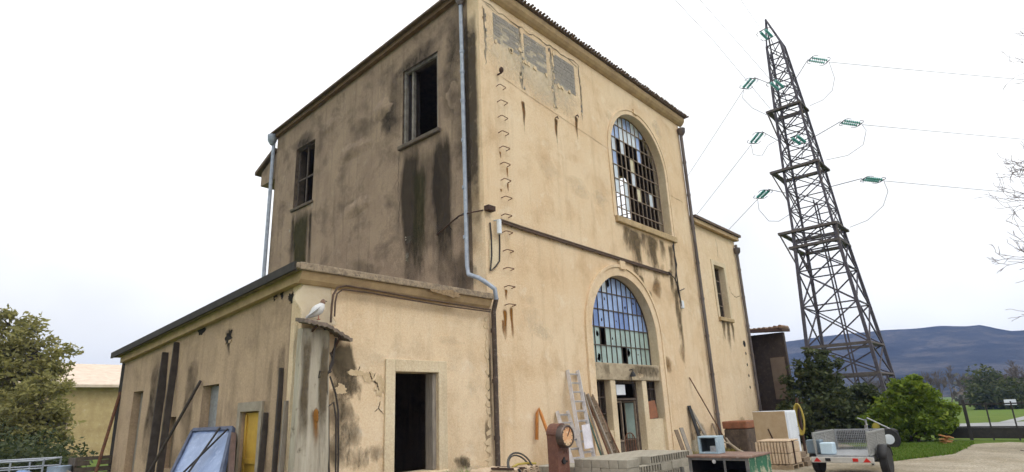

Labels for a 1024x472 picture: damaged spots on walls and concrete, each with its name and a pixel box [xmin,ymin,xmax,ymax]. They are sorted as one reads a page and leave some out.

damp [292,213,311,262]
damp [401,138,451,260]
damp [301,339,356,461]
peeling [335,369,385,397]